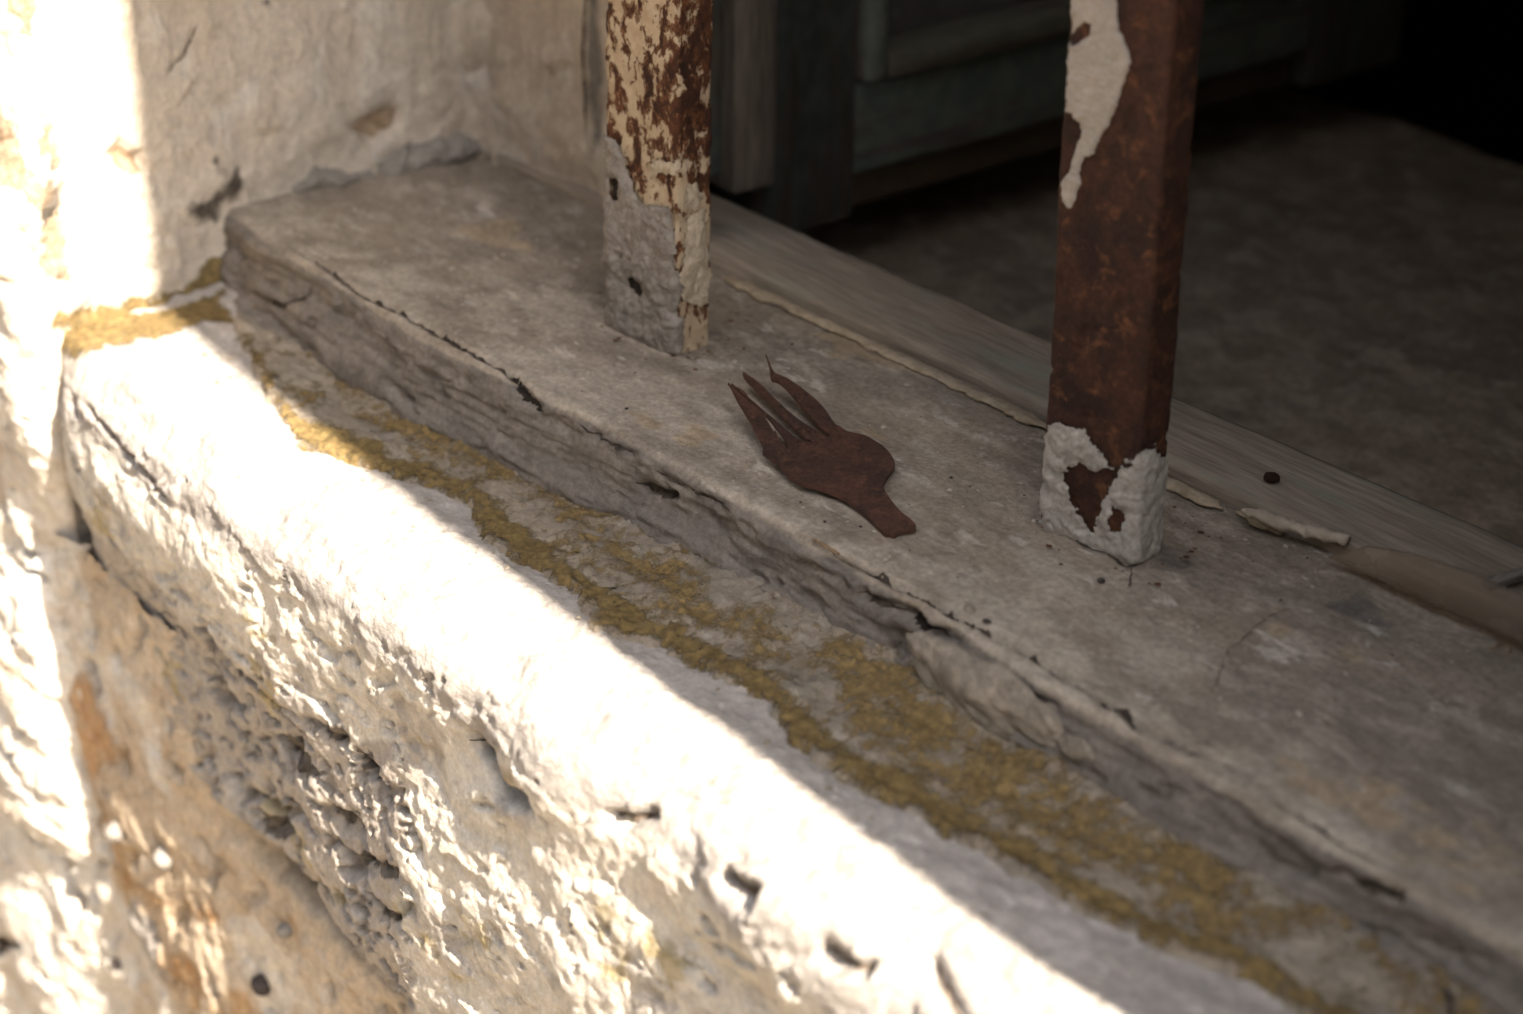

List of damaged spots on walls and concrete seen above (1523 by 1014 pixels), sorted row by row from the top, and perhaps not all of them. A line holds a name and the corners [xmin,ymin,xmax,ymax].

peeling [1060,0,1131,208]